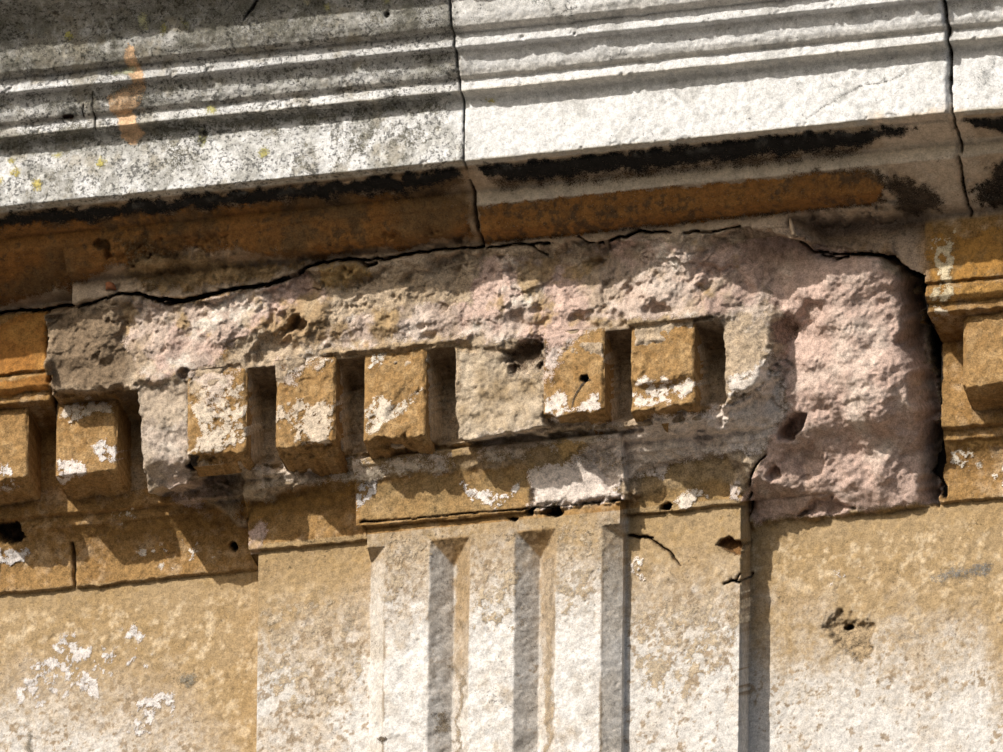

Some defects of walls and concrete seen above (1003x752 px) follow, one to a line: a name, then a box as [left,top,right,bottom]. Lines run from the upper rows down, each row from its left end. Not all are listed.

corrosion [107,43,146,145]
crack [943,1,973,212]
leakage [963,116,1003,134]
leakage [476,123,919,185]
leakage [860,166,947,217]
crack [0,179,551,315]
peeling [56,459,86,485]
peeling [59,396,114,423]
peeling [92,440,123,463]
spalling [117,228,984,632]
crack [362,500,619,523]
crack [628,534,680,565]